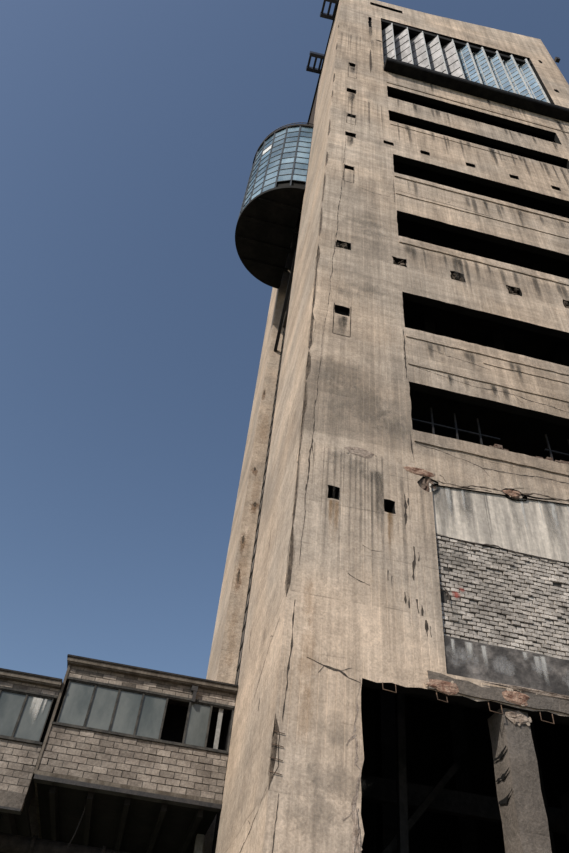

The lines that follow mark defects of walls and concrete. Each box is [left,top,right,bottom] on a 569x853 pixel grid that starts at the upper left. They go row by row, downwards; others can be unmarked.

crack [323,132,428,333]
crack [299,353,322,564]
spalling [403,466,569,501]
crack [251,601,360,720]
spalling [424,677,459,695]
spalling [481,681,569,726]
spalling [268,717,285,787]
crack [240,785,279,853]